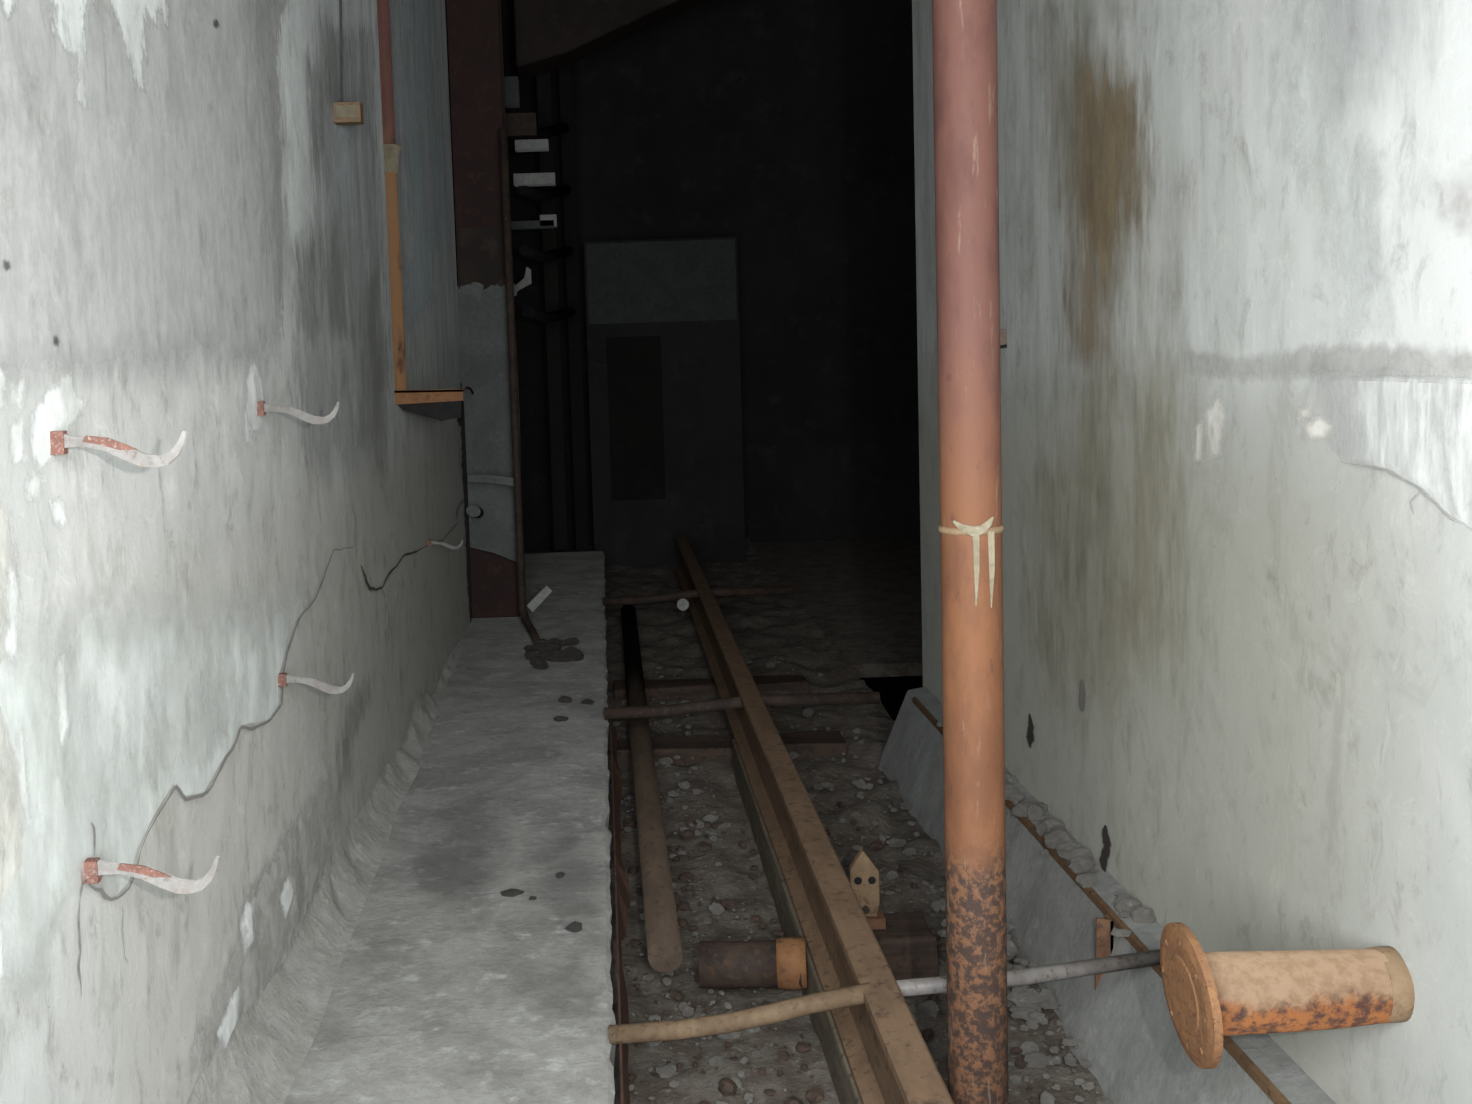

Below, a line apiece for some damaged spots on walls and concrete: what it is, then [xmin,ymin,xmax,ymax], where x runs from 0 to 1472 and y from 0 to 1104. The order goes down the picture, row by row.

damp [0,0,287,372]
rust [1065,61,1139,356]
crack [1343,462,1457,523]
crack [78,383,472,984]